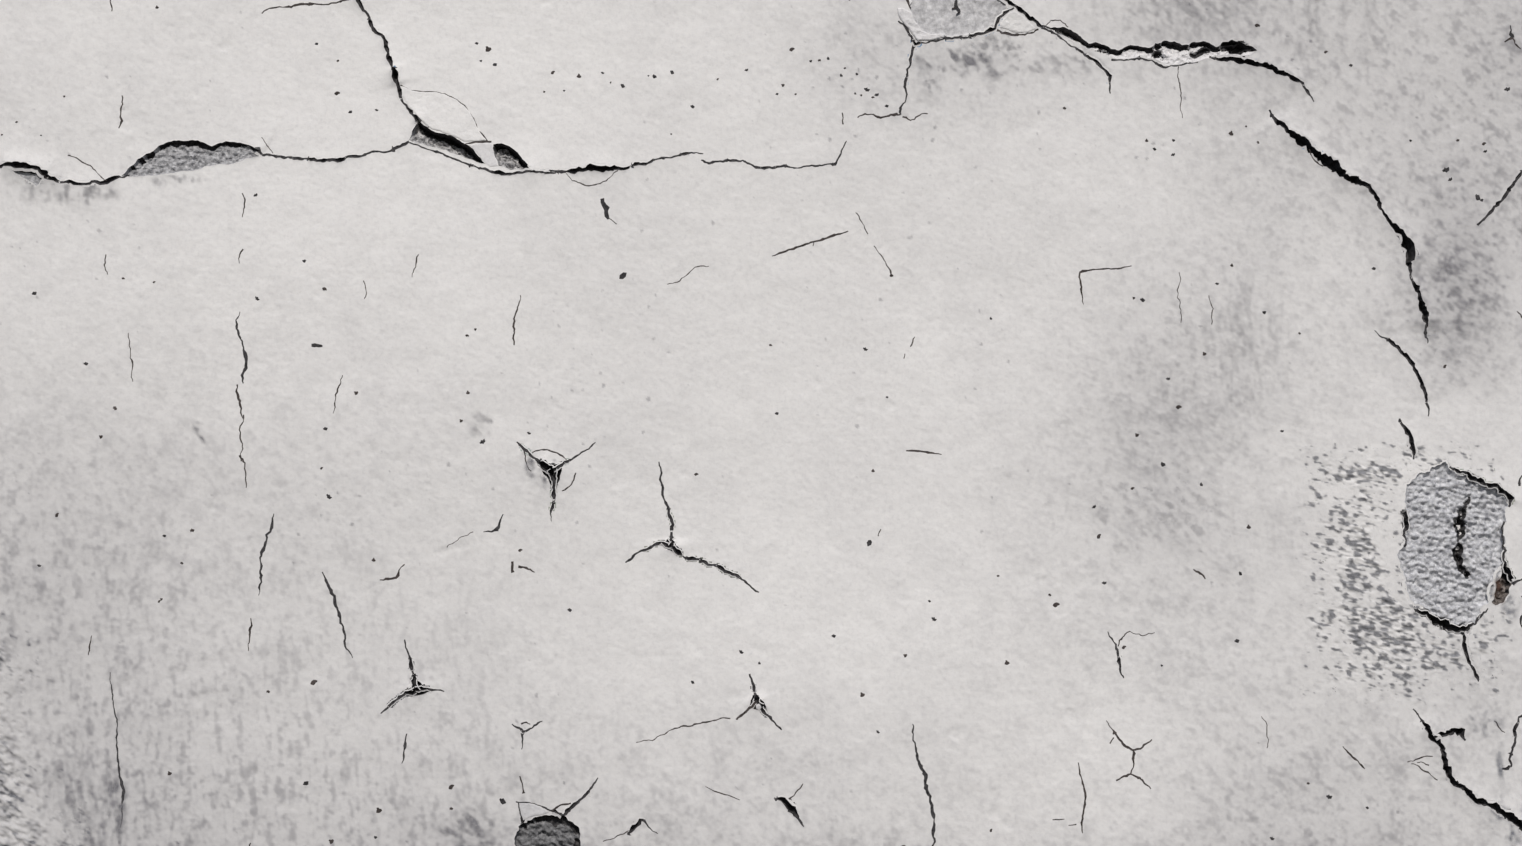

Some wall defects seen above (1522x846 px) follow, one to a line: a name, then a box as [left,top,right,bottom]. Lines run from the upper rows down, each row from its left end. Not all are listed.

spalling [897,0,1259,67]
crack [0,155,130,187]
spalling [121,139,261,179]
crack [255,0,1522,682]
spalling [1396,459,1509,626]
peeling [0,611,115,846]
crack [381,640,444,763]
peeling [519,803,549,820]
crack [636,674,782,743]
crack [912,724,936,846]
crack [1052,720,1152,833]
crack [1407,709,1522,840]